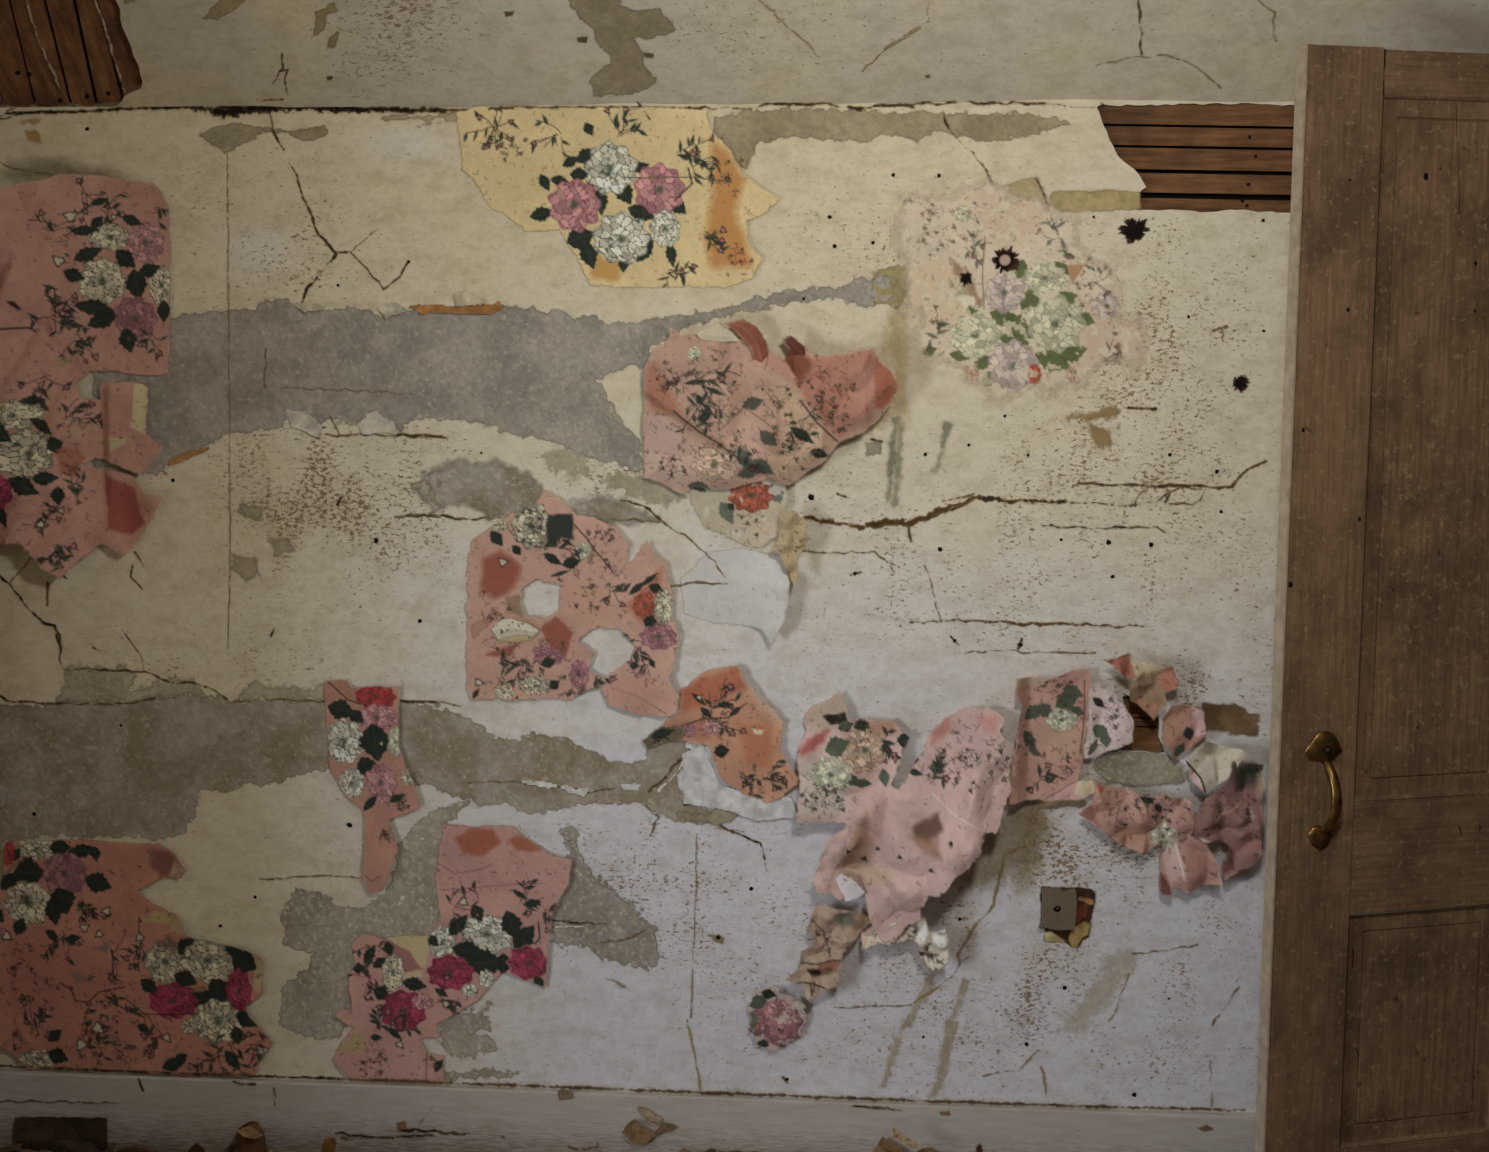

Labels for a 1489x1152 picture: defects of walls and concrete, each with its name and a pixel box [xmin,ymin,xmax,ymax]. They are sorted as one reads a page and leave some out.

flaking render [0,0,142,108]
flaking render [569,0,675,97]
crack [264,53,408,303]
flaking render [1003,103,1295,244]
crack [225,155,233,637]
crack [264,349,447,439]
flaking render [92,265,908,476]
crack [803,460,1267,654]
flaking render [0,664,330,844]
flaking render [279,701,797,1040]
flaking render [440,1001,519,1082]